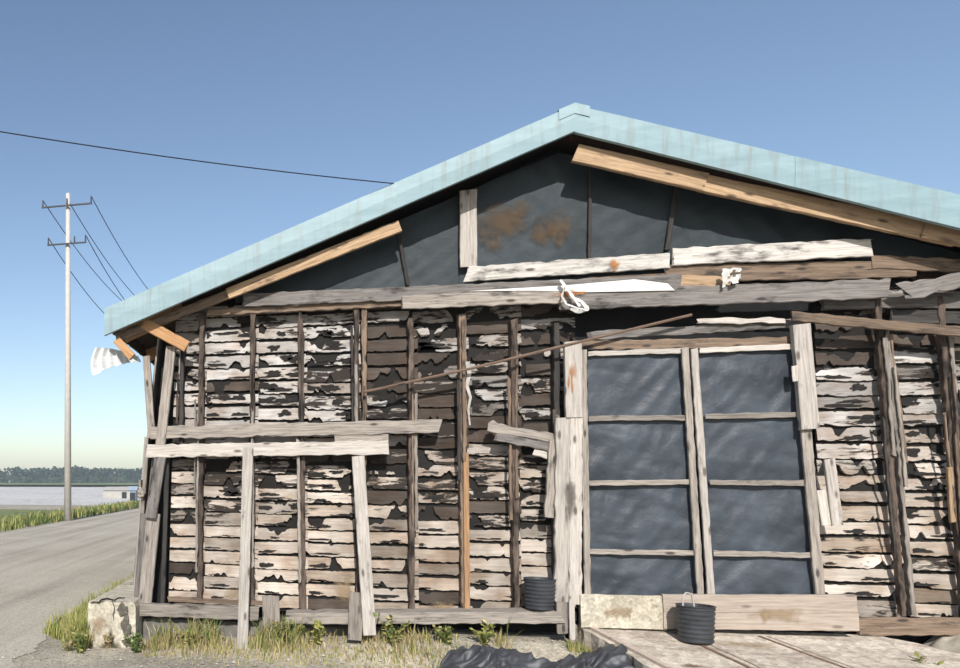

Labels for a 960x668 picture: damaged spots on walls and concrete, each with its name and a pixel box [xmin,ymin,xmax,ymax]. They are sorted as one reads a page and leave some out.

peeling [308,329,351,366]
peeling [418,340,452,350]
peeling [206,316,299,417]
peeling [824,369,881,440]
peeling [903,420,937,436]
peeling [907,448,920,457]
peeling [219,487,241,510]
peeling [267,467,343,503]
peeling [910,471,947,501]
peeling [259,492,298,567]
peeling [309,553,337,595]
peeling [846,577,894,596]